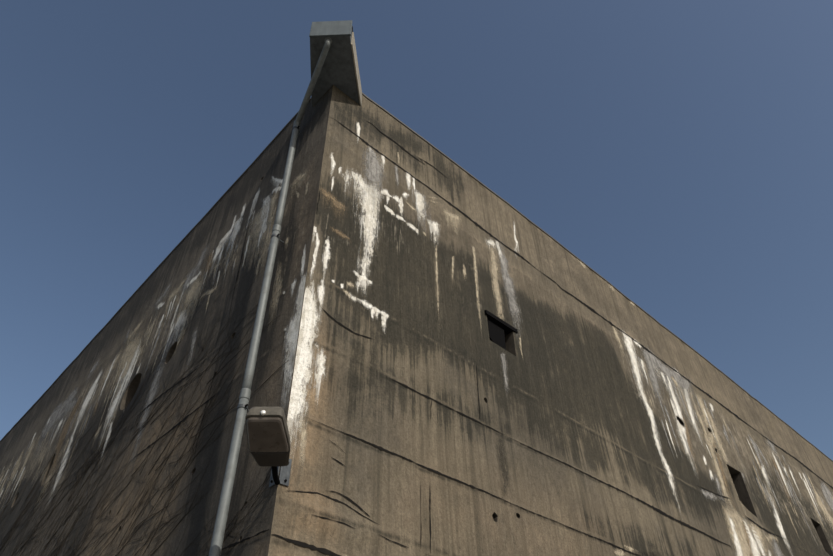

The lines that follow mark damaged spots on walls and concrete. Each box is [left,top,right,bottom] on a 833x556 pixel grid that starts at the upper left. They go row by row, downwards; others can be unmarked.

efflorescence [0,172,308,505]
crack [320,306,372,339]
efflorescence [272,148,439,454]
efflorescence [487,240,519,317]
crack [336,120,833,489]
crack [135,344,221,472]
crack [207,529,341,556]
crack [309,418,640,556]
crack [386,364,730,546]
leakage [613,326,833,556]
crack [745,516,784,539]